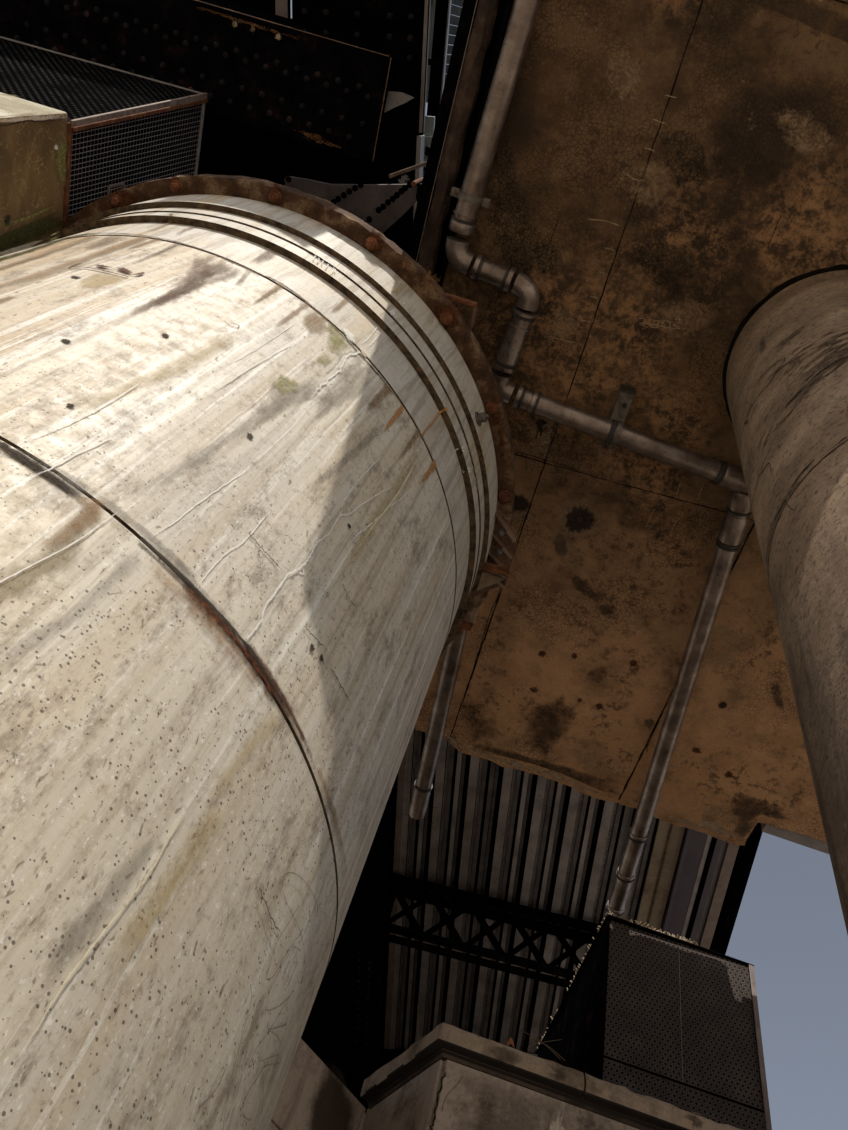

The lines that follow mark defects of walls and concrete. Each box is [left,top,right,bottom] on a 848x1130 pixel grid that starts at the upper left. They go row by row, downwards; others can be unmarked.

rust [68,263,145,277]
water stain [311,1072,365,1130]
crack [429,1073,446,1130]